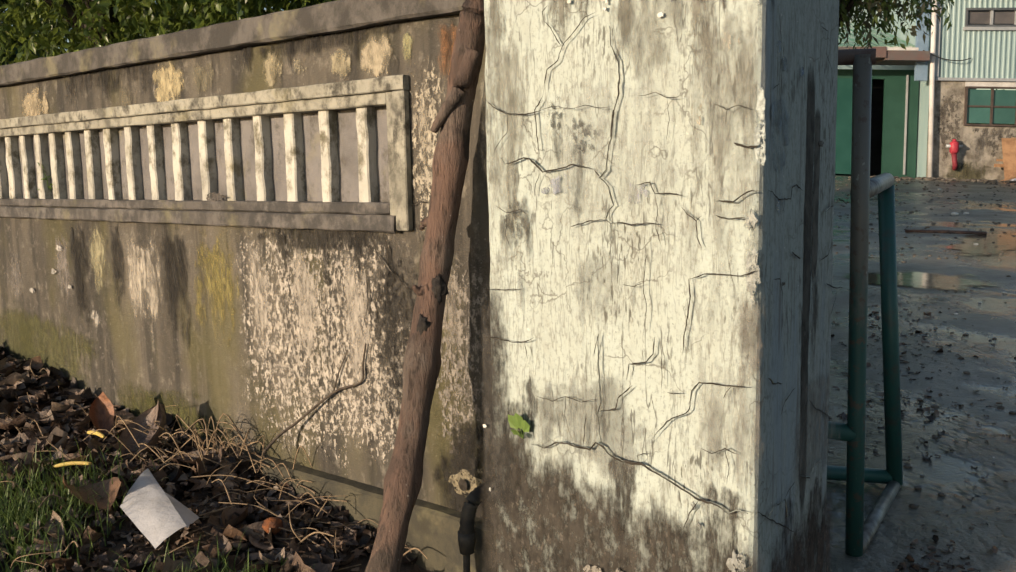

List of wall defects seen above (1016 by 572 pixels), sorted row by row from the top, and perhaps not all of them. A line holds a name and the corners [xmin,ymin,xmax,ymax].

water stain [691,0,717,57]
water stain [56,227,222,348]
water stain [257,228,418,434]
crack [485,5,831,532]
water stain [434,297,754,572]